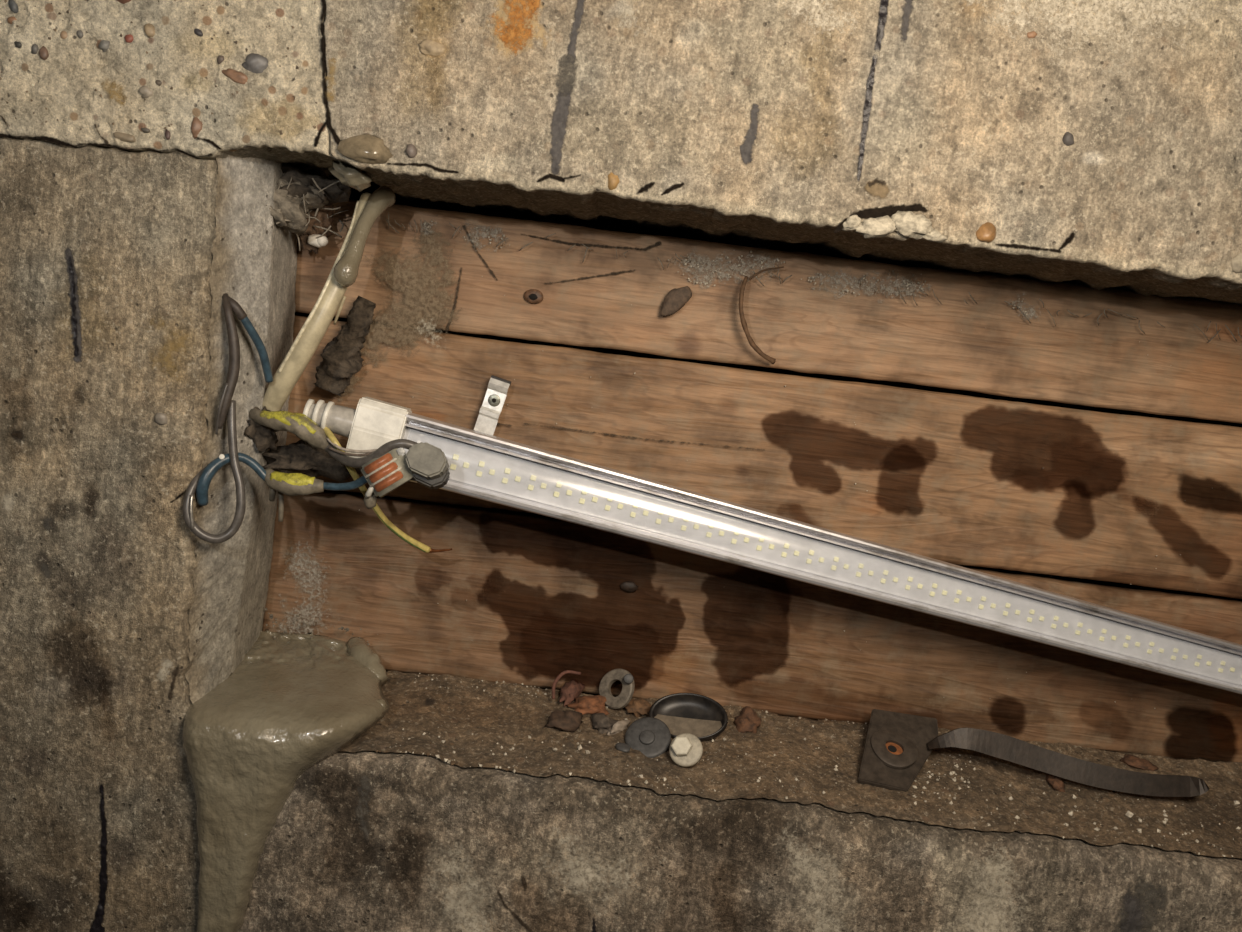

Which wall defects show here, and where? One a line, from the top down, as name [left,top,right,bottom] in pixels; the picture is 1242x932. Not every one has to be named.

crack [314,0,341,147]
corrosion [492,0,547,54]
crack [0,116,222,157]
leakage [763,412,935,513]
leakage [962,407,1124,538]
leakage [1136,498,1229,577]
leakage [1180,475,1242,512]
leakage [479,509,685,690]
leakage [703,567,789,685]